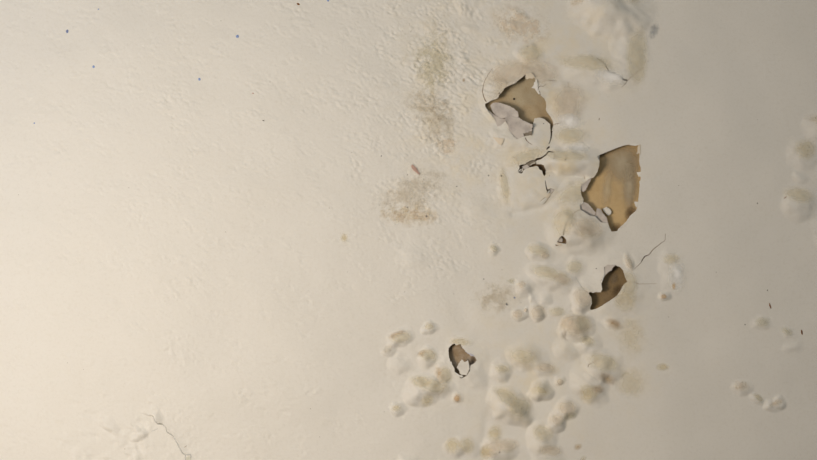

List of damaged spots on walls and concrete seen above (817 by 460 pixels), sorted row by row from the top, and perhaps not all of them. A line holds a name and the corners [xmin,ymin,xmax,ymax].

spalling [478,54,562,139]
spalling [580,144,641,232]
spalling [580,243,661,318]
spalling [440,330,490,384]
crack [152,416,192,460]